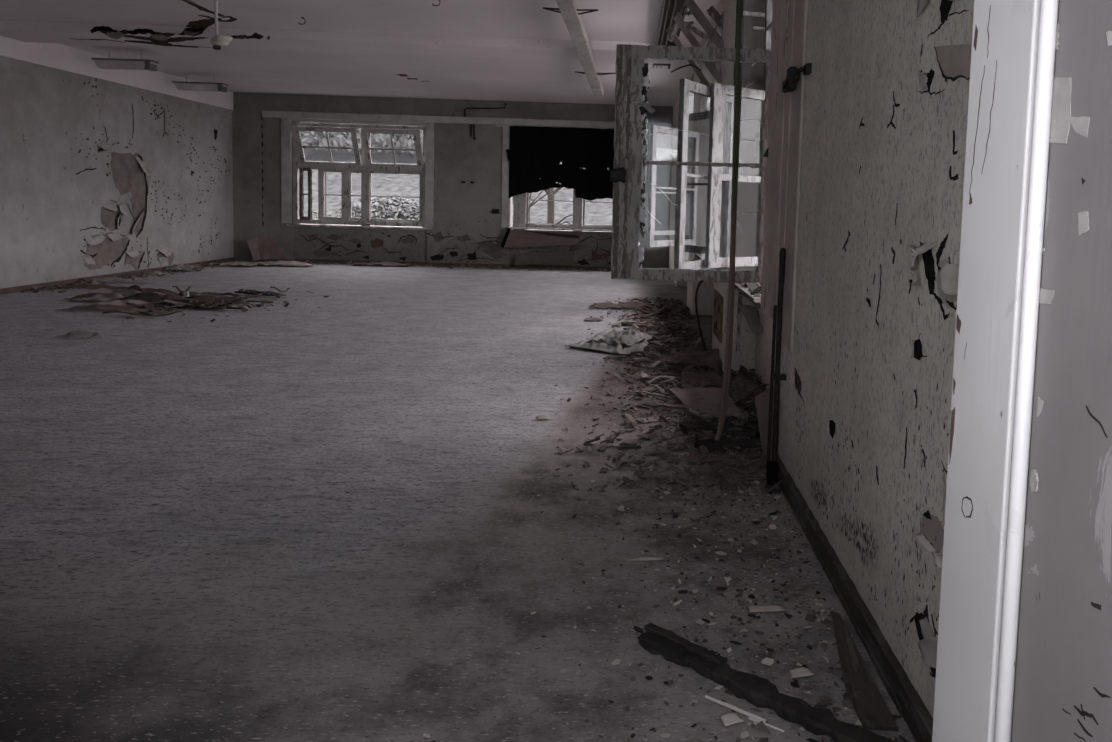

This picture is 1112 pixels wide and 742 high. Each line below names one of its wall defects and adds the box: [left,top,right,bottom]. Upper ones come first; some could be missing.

peeling [90,15,237,48]
peeling [917,0,978,95]
crack [859,91,900,129]
peeling [76,96,229,270]
peeling [295,213,612,266]
spalling [906,234,961,334]
spalling [910,333,928,360]
peeling [819,420,868,528]
spalling [868,370,956,678]